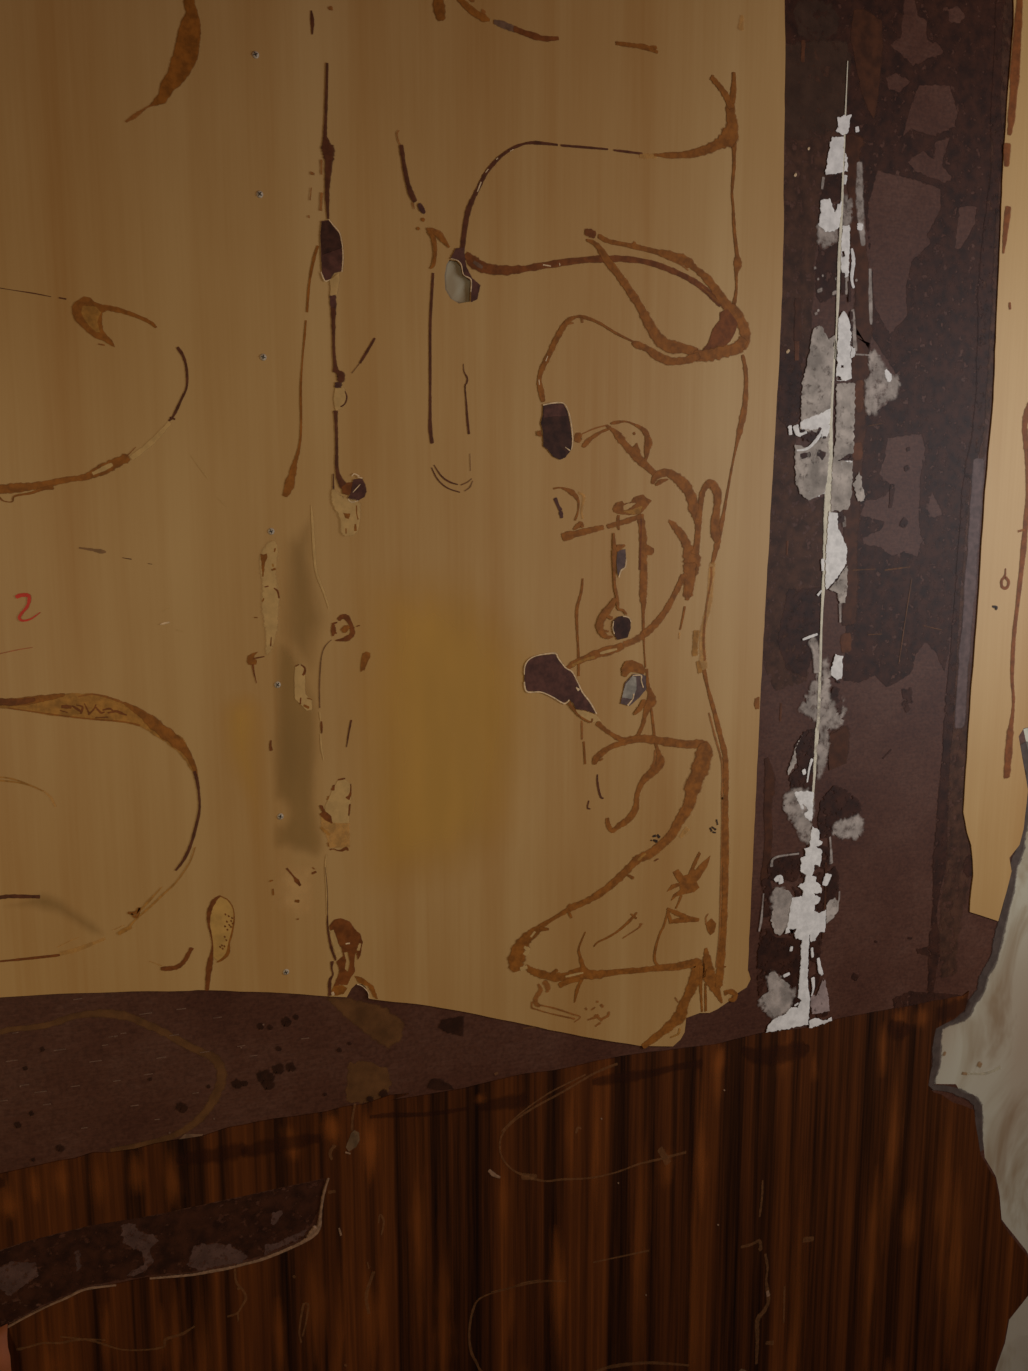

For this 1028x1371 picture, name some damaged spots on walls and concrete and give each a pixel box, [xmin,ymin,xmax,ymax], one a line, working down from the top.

crack [308,6,335,219]
crack [731,142,742,305]
crack [0,347,188,503]
peeling [757,61,900,1033]
peeling [524,652,601,723]
crack [692,355,748,987]
crack [0,892,40,900]
crack [0,954,60,962]
crack [161,947,194,971]
peeling [0,1324,11,1371]